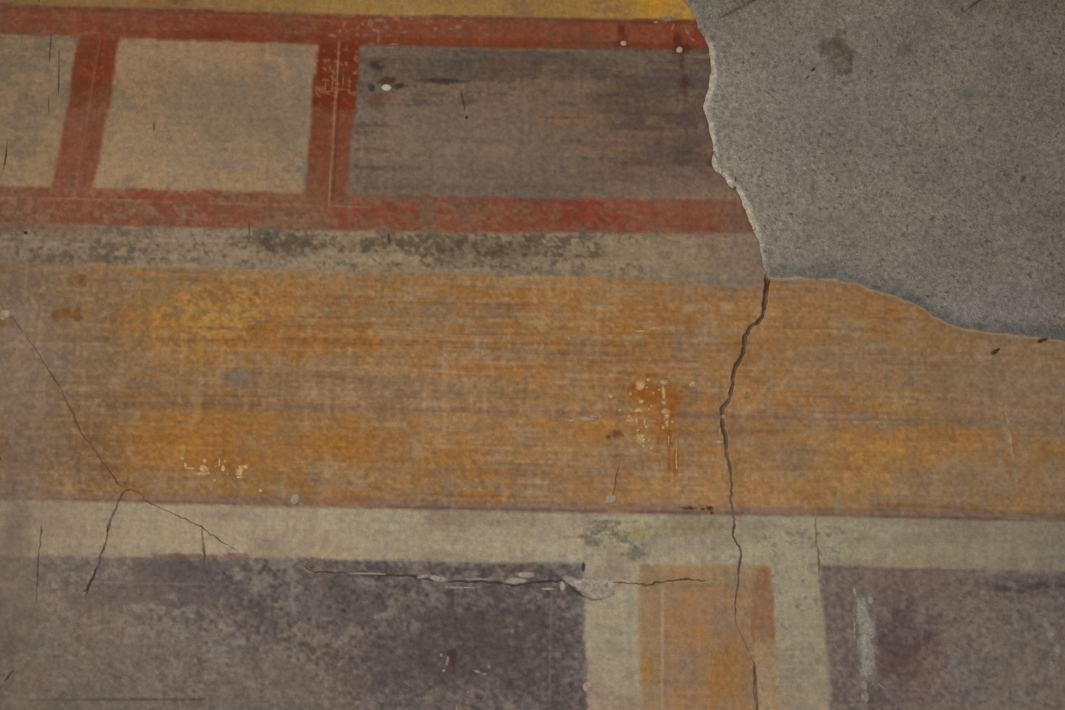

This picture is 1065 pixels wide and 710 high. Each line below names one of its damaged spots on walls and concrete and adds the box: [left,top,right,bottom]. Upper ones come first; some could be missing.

flaking render [654,0,1065,344]
crack [715,274,771,626]
crack [83,468,228,594]
crack [305,567,705,599]
crack [750,654,758,710]